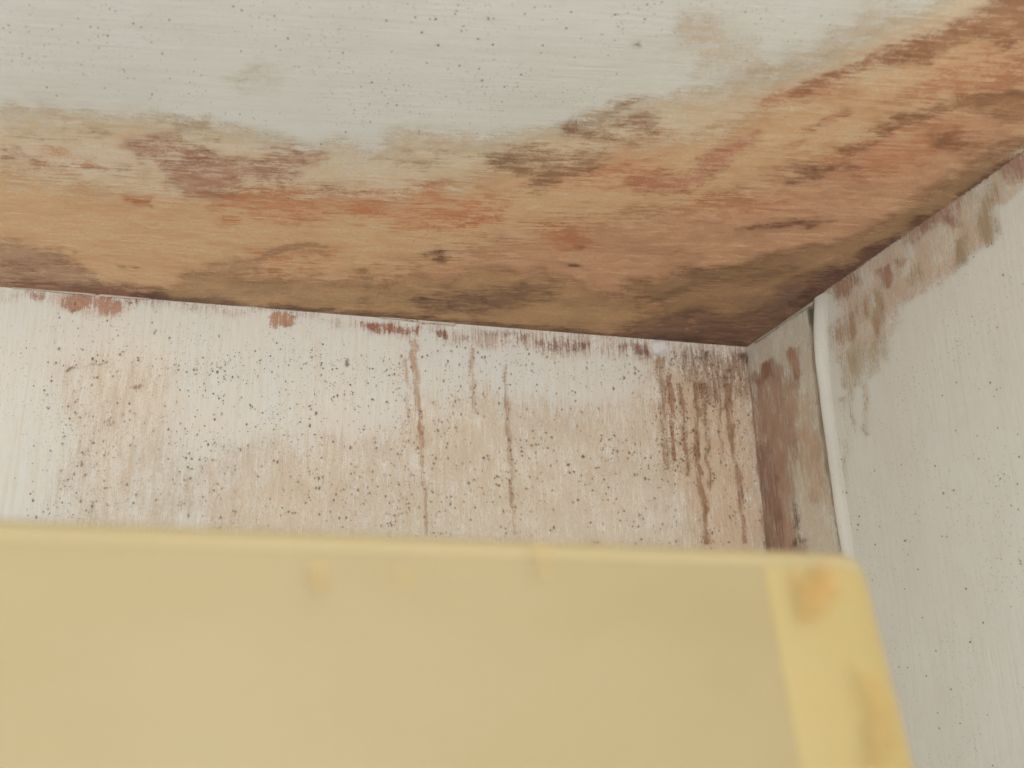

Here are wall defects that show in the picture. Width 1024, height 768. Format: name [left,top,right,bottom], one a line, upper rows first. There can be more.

leakage [0,0,1024,553]
corrosion [57,294,130,316]
corrosion [361,322,419,335]